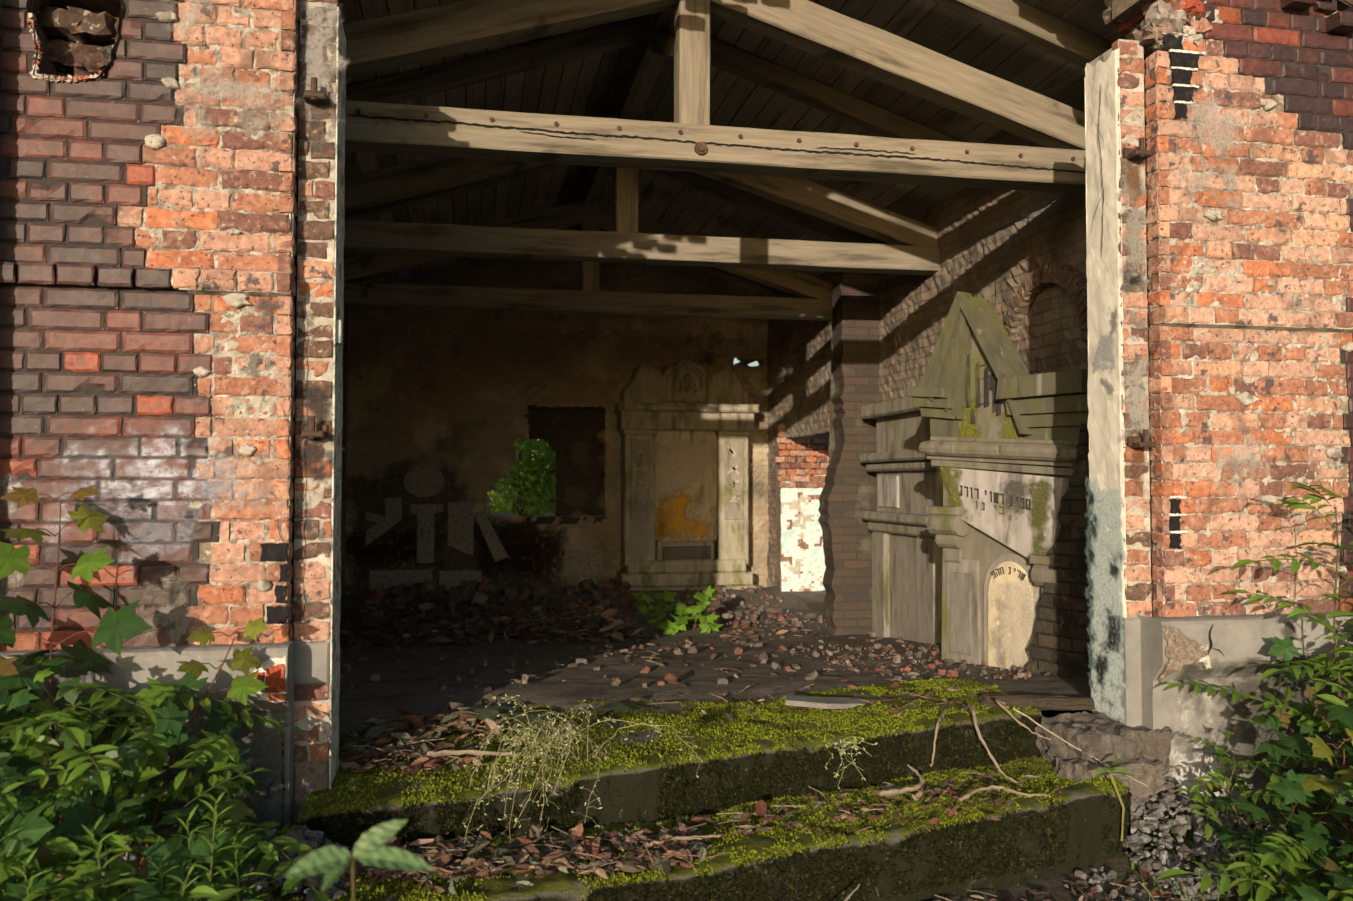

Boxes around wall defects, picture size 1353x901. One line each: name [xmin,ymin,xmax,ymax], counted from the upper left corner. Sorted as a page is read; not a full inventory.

spalling [26,0,126,83]
peeling [1149,32,1353,684]